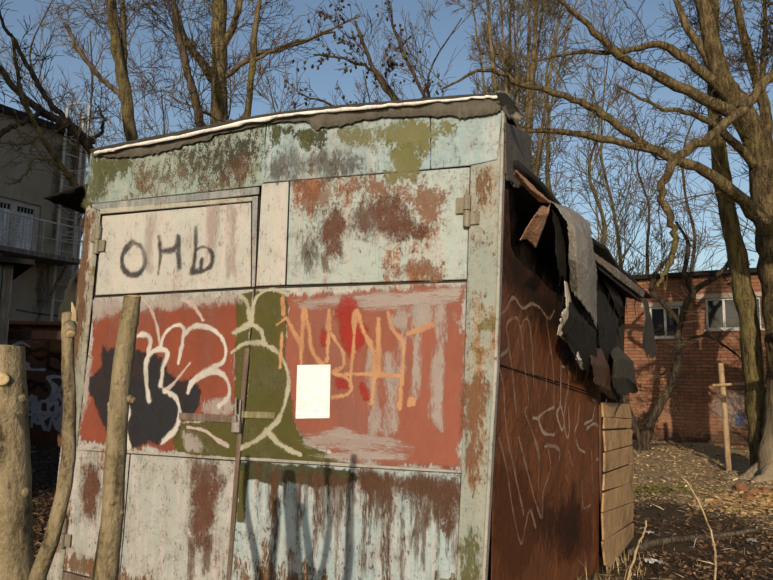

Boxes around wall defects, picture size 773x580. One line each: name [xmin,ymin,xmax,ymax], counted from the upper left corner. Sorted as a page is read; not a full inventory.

rust [290,174,452,273]
rust [384,258,445,283]
rust [62,552,94,579]
rust [80,463,103,520]
rust [187,459,226,580]
rust [233,472,336,580]
rust [337,373,490,580]